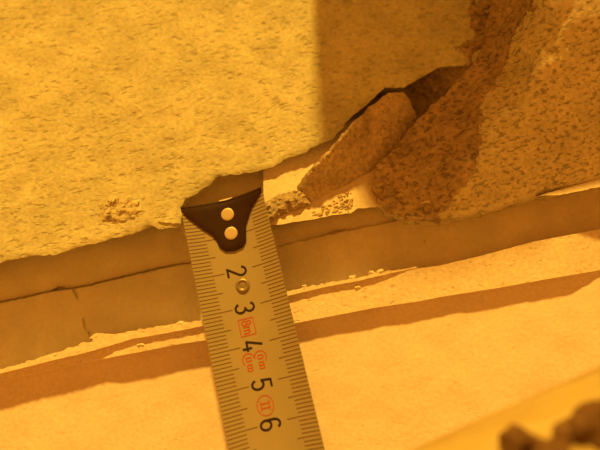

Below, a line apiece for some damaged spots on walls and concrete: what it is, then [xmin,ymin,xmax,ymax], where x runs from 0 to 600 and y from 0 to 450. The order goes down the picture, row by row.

spalling [399,0,490,119]
crack [0,262,191,303]